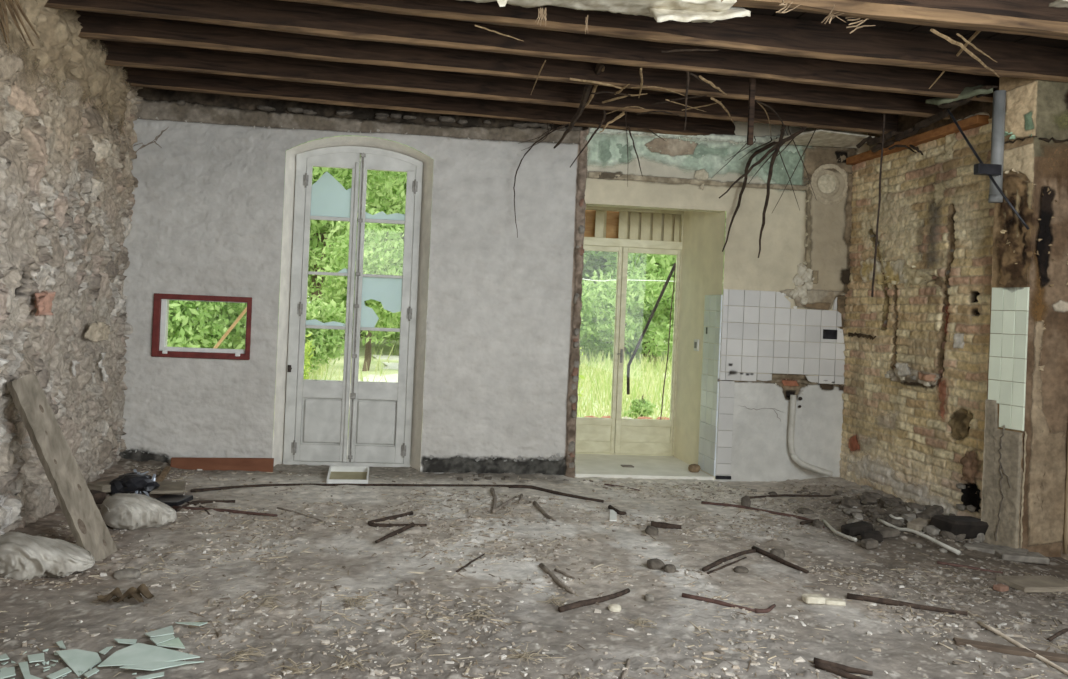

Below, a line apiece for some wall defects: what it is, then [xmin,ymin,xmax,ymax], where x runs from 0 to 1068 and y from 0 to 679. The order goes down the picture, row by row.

peeling [135,99,787,158]
peeling [1003,81,1037,185]
peeling [780,174,951,336]
leakage [995,144,1068,327]
spalling [771,373,844,399]
spalling [885,351,945,389]
spalling [422,441,575,475]
spalling [948,408,982,512]